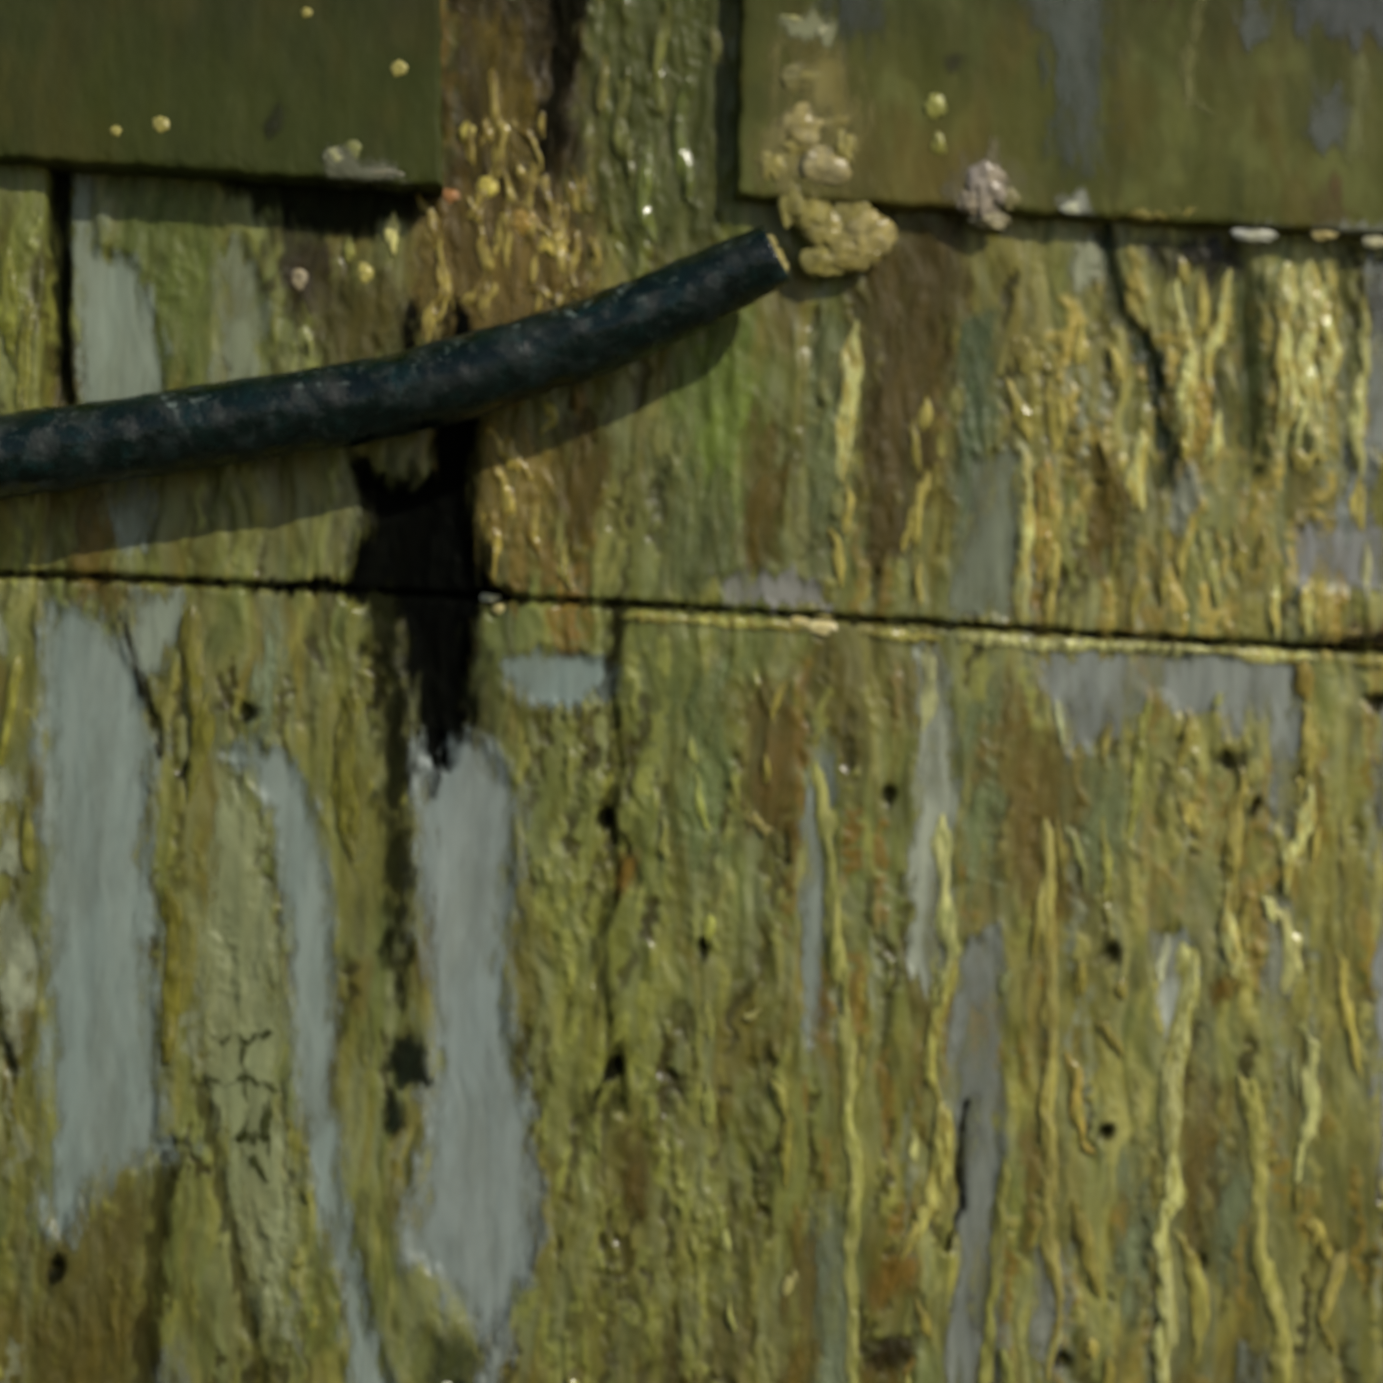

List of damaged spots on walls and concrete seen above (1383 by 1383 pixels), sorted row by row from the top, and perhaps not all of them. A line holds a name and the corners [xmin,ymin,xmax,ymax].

spalling [1059,190,1090,217]
spalling [1107,208,1195,226]
spalling [1230,222,1287,242]
spalling [1306,222,1383,291]
peeling [1297,337,1383,593]
leakage [255,418,574,1011]
peeling [1041,637,1128,761]
spalling [1217,751,1246,769]
peeling [1163,646,1301,761]
peeling [0,586,186,1235]
peeling [199,743,386,1383]
peeling [402,730,547,1383]